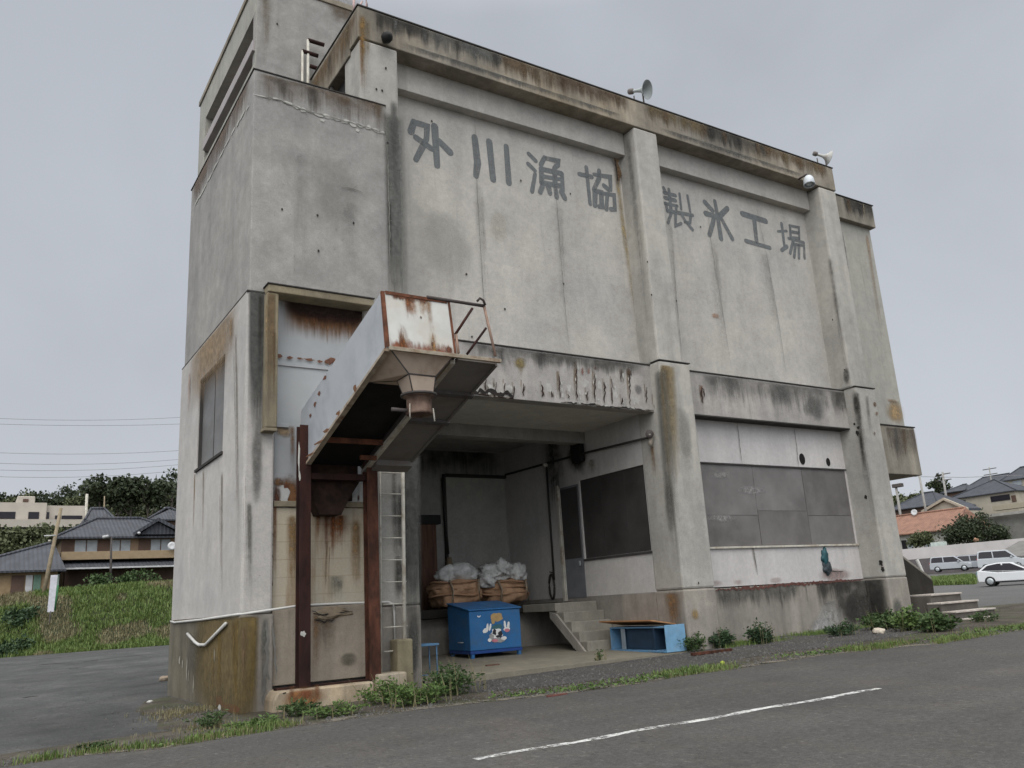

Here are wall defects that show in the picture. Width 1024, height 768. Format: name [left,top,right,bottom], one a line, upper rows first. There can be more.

water stain [377,13,626,113]
water stain [249,291,265,418]
corrosion [266,294,336,417]
corrosion [291,302,361,336]
corrosion [393,295,430,319]
corrosion [392,335,452,353]
water stain [245,439,260,491]
corrosion [277,427,293,451]
water stain [657,371,690,492]
corrosion [274,478,296,552]
corrosion [317,515,358,557]
water stain [718,580,902,623]